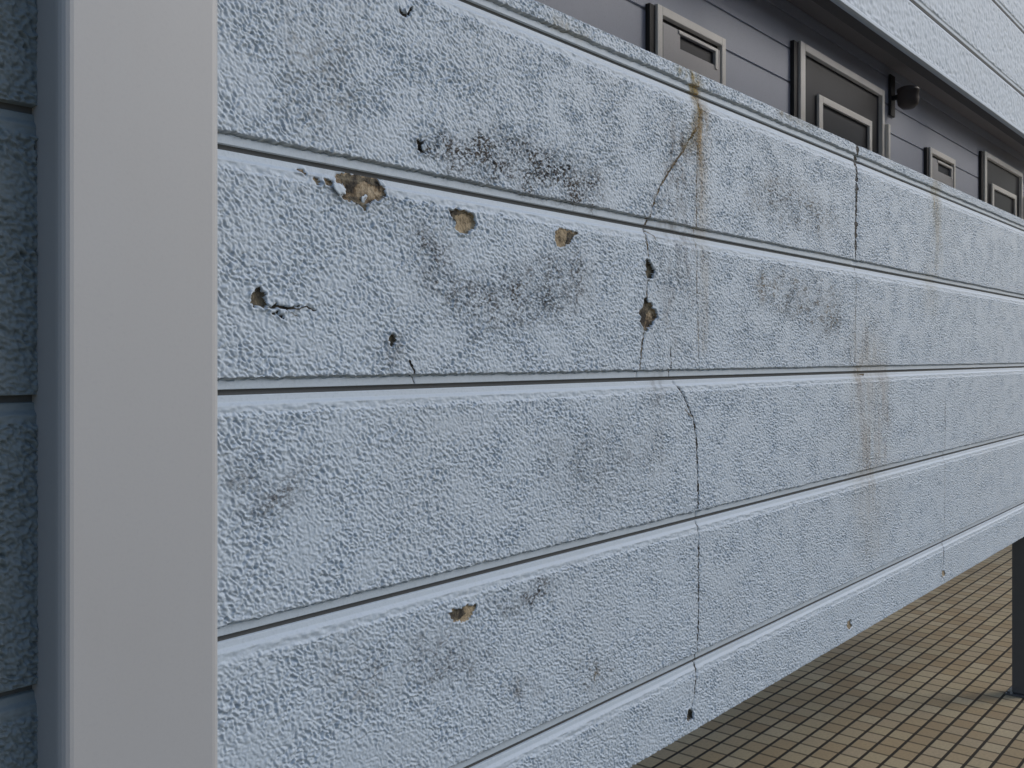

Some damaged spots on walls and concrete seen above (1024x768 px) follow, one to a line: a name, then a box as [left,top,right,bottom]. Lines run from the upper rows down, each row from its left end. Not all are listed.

corrosion [689,72,702,155]
spalling [297,169,386,211]
leakage [420,131,601,210]
spalling [449,209,476,234]
spalling [555,228,578,248]
crack [643,97,700,357]
crack [852,145,860,363]
crack [267,305,316,317]
spalling [639,298,657,332]
crack [667,348,700,710]
spalling [449,604,476,623]